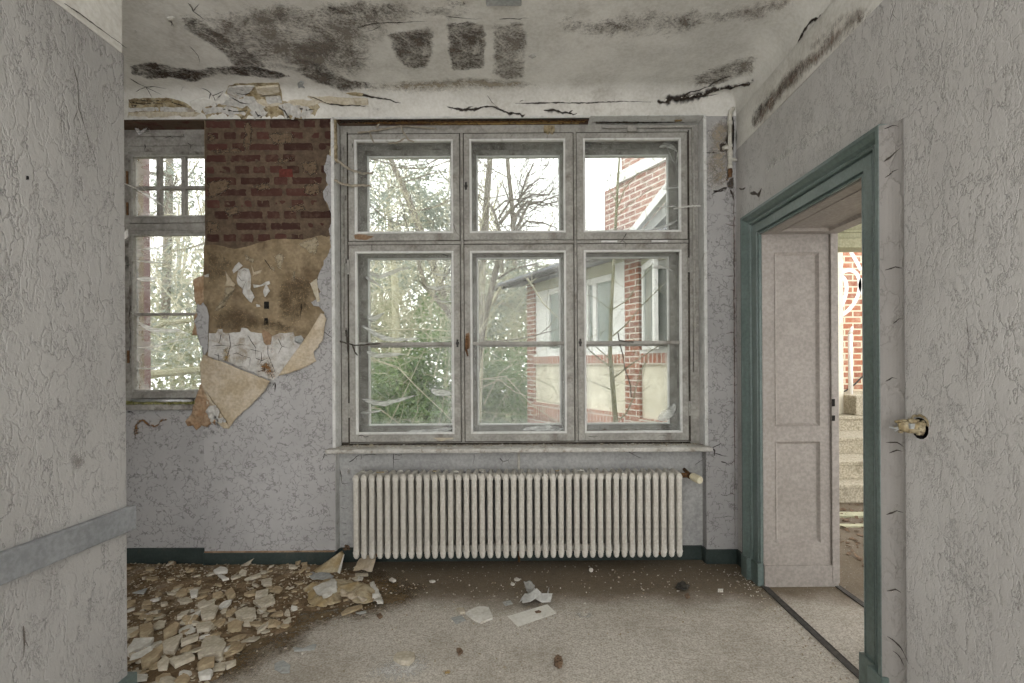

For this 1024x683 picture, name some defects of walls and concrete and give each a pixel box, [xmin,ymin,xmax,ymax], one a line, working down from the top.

leakage [132,3,405,90]
leakage [384,22,526,89]
leakage [696,57,753,84]
leakage [752,13,862,126]
crack [448,98,641,117]
flaking render [202,81,338,380]
spalling [889,414,929,439]